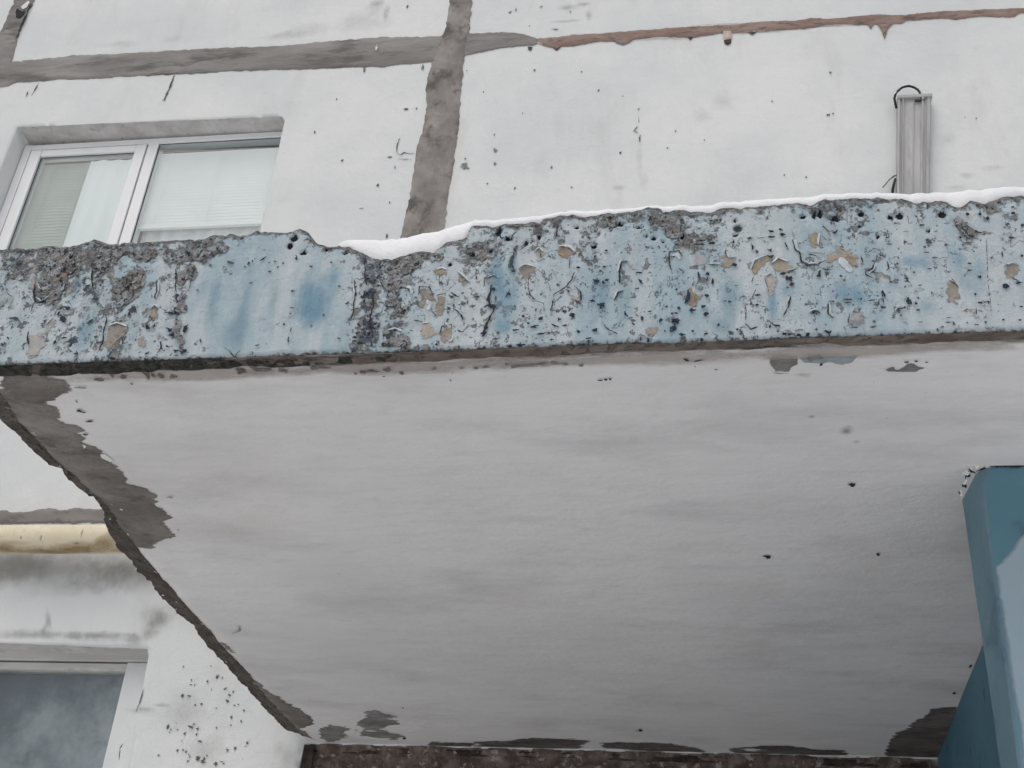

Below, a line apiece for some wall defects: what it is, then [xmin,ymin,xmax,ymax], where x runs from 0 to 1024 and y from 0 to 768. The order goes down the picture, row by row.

spalling [1,238,253,360]
spalling [268,235,313,273]
spalling [337,228,605,353]
spalling [597,213,623,230]
peeling [624,211,797,342]
peeling [799,210,859,277]
peeling [888,213,948,273]
spalling [938,196,1024,239]
peeling [1001,251,1023,289]
water stain [0,331,1024,380]
peeling [769,355,857,374]
peeling [886,360,928,372]